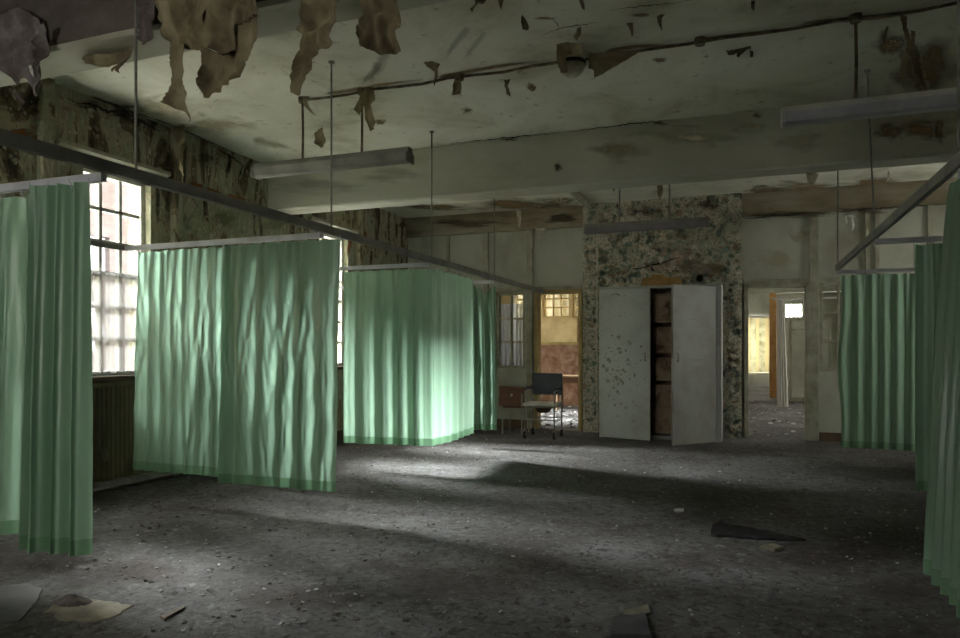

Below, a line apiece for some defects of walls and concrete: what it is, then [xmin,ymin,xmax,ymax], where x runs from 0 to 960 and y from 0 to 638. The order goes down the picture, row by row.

water stain [879,33,956,91]
crack [67,98,160,132]